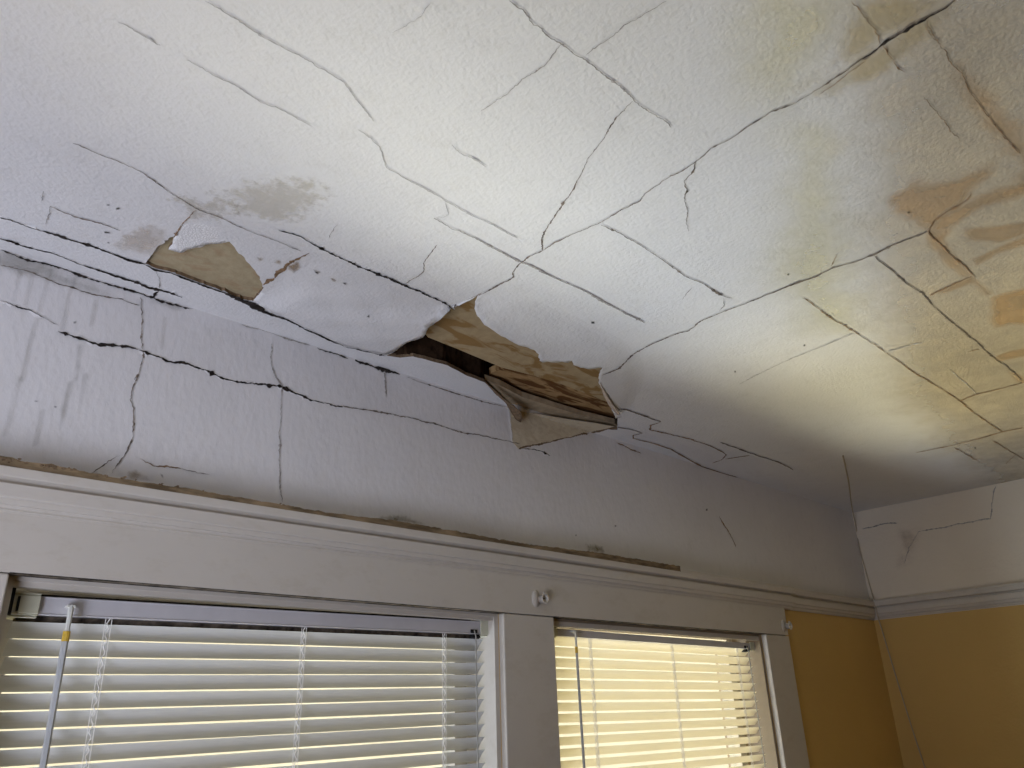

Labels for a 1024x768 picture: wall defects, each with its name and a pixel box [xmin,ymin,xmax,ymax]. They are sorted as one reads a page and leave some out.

peeling [147,221,309,298]
crack [73,0,1023,461]
leakage [901,11,1024,481]
crack [0,193,550,502]
peeling [485,382,614,450]
crack [617,409,793,477]
crack [863,487,996,563]